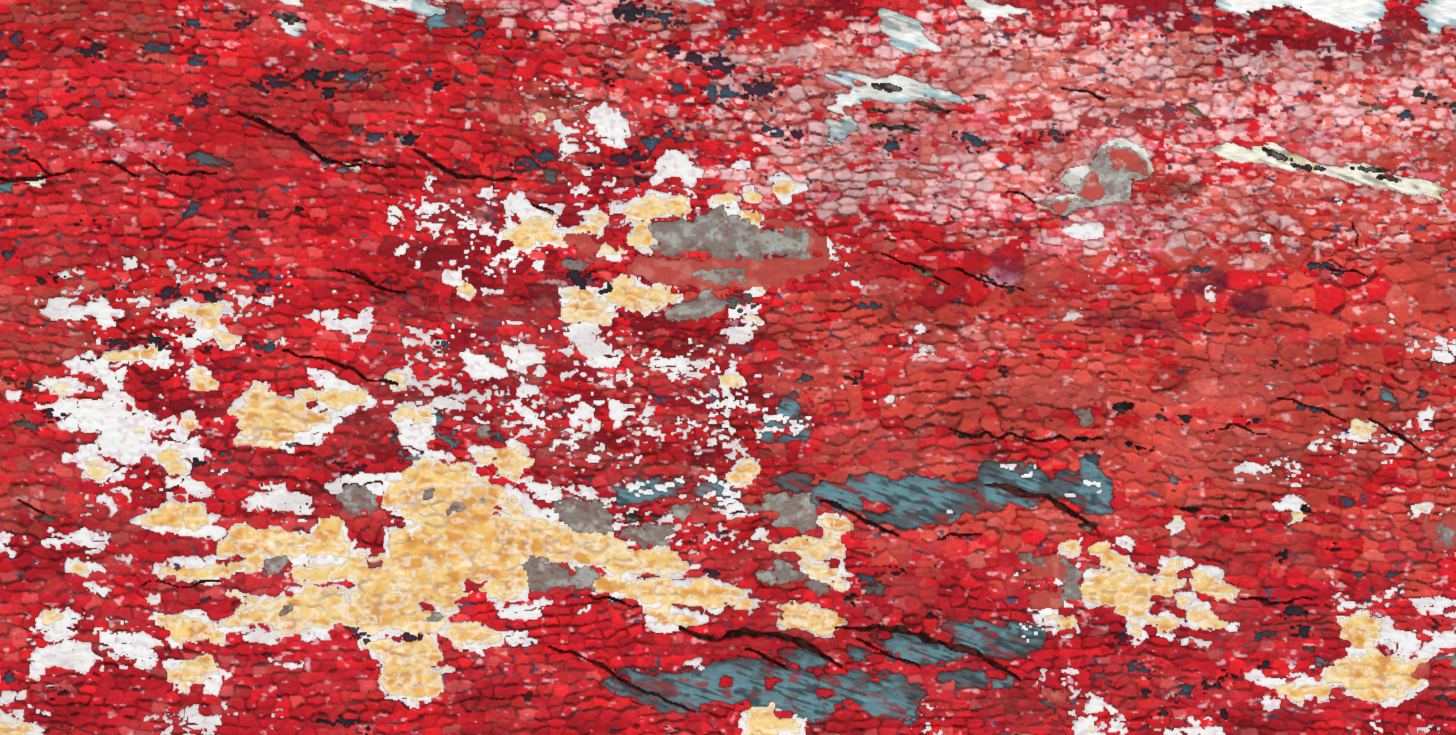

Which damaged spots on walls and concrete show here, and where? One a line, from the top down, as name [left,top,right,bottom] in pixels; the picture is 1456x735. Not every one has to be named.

peeling [1215,0,1388,33]
peeling [1414,0,1456,35]
spalling [612,0,777,104]
crack [0,151,234,193]
crack [239,112,552,211]
peeling [1209,142,1448,206]
spalling [0,70,1241,735]
spalling [1234,360,1456,525]
crack [591,595,626,604]
crack [549,645,693,711]
crack [679,624,1020,680]
spalling [1149,571,1456,735]